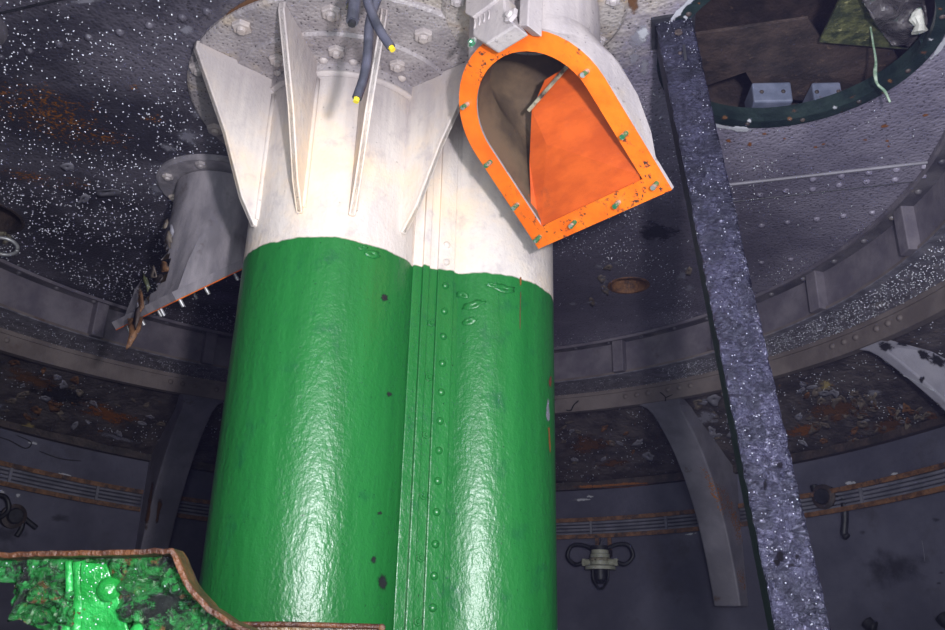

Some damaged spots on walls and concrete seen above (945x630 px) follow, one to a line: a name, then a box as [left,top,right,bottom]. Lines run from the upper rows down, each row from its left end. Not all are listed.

corrosion [1,83,131,154]
peeling [879,342,936,392]
peeling [918,350,945,367]